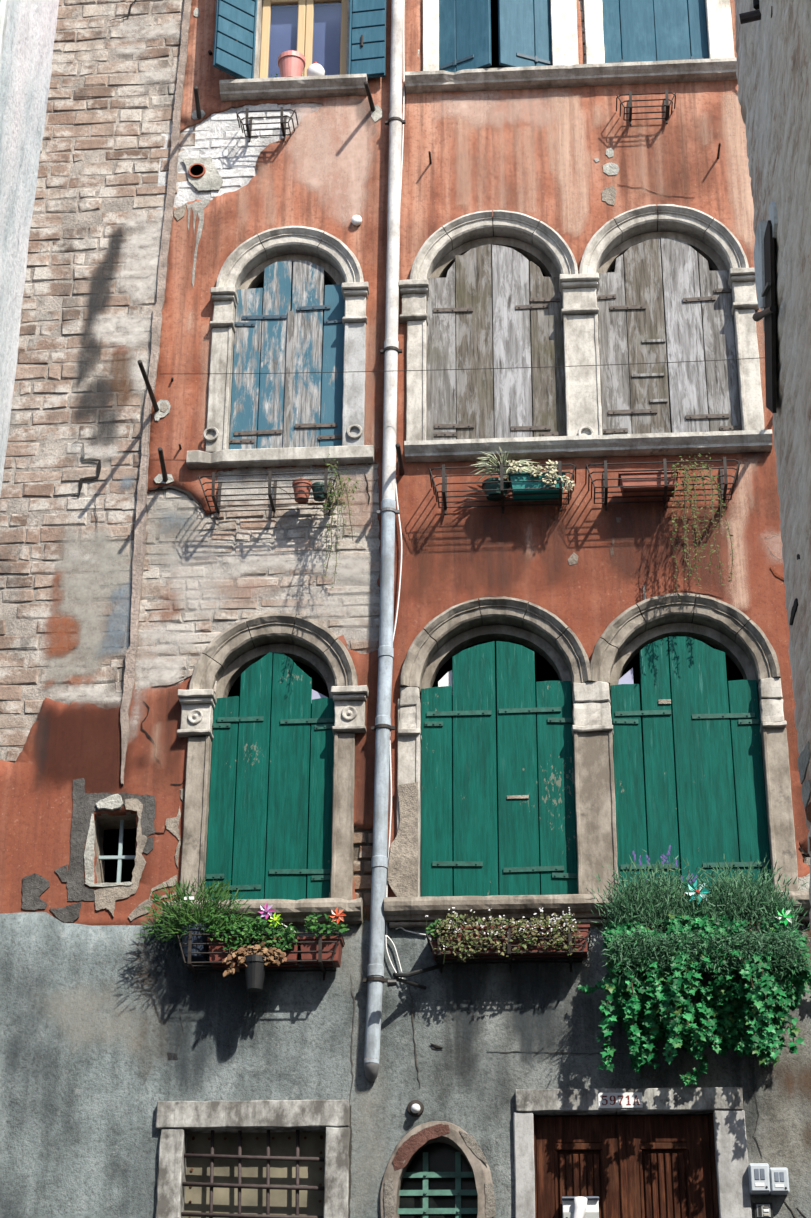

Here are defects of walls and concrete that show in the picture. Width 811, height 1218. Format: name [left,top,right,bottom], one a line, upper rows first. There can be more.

leakage [447,93,494,148]
leakage [550,95,588,232]
leakage [726,94,755,244]
flaking render [0,0,381,763]
peeling [22,788,184,923]
flaking render [798,837,811,891]